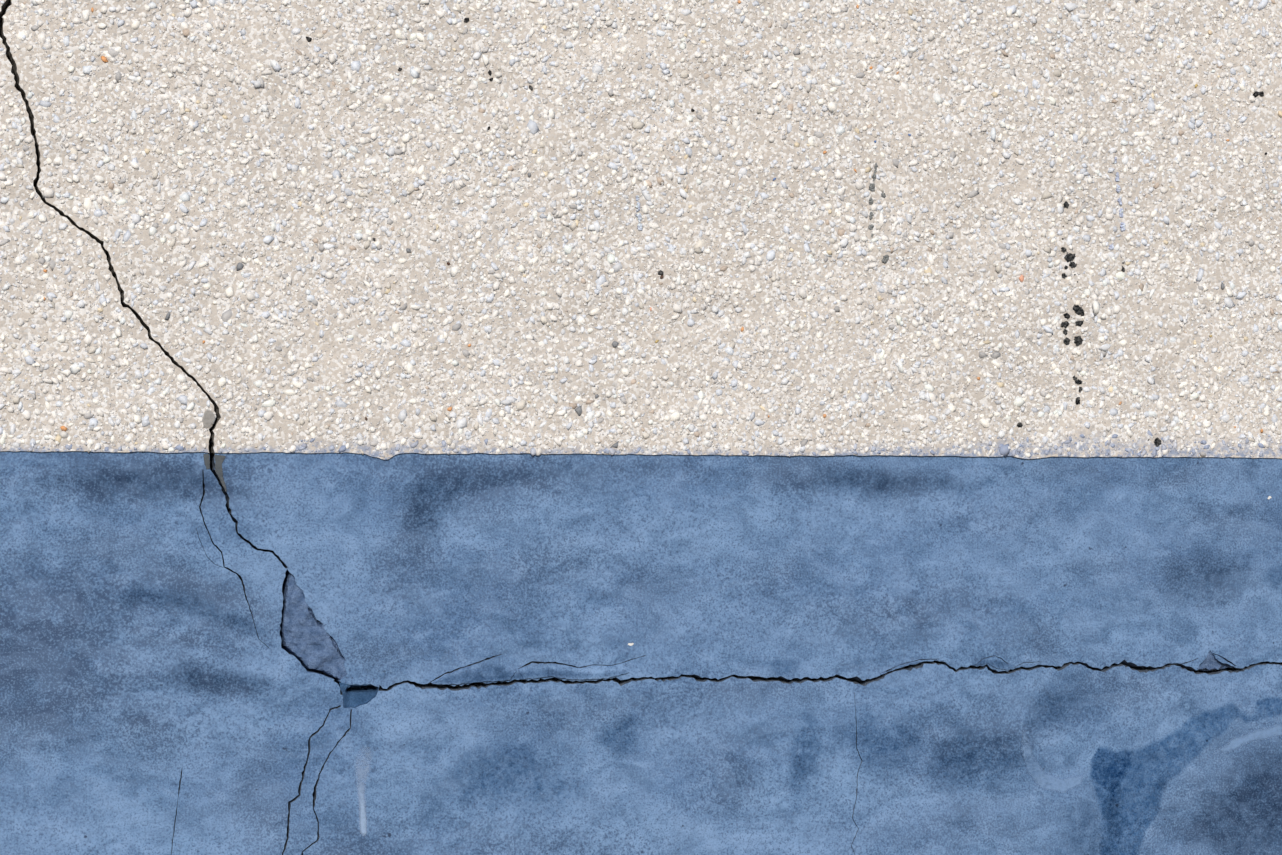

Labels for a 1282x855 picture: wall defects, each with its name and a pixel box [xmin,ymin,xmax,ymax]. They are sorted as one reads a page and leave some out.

crack [0,0,288,648]
spalling [280,569,379,708]
crack [171,770,182,854]
crack [282,679,352,855]
crack [378,653,1282,854]